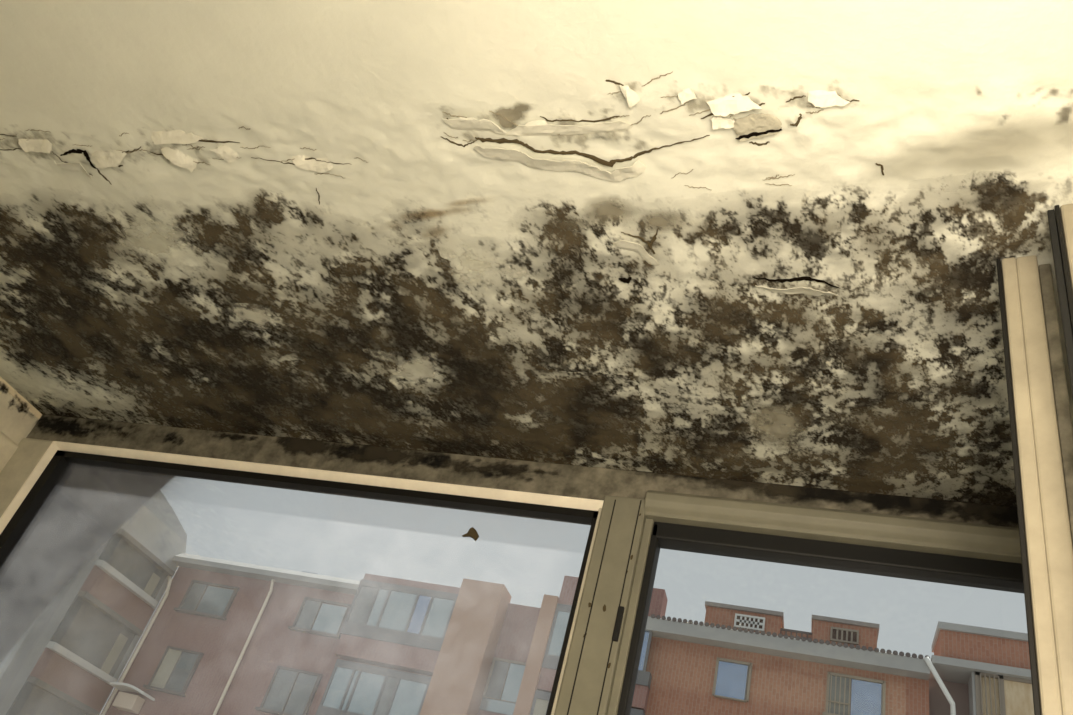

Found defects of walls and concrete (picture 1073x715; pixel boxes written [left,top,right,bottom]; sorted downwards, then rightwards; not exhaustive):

peeling [0,129,367,185]
peeling [441,71,765,182]
peeling [786,90,859,127]
leakage [0,174,1051,528]